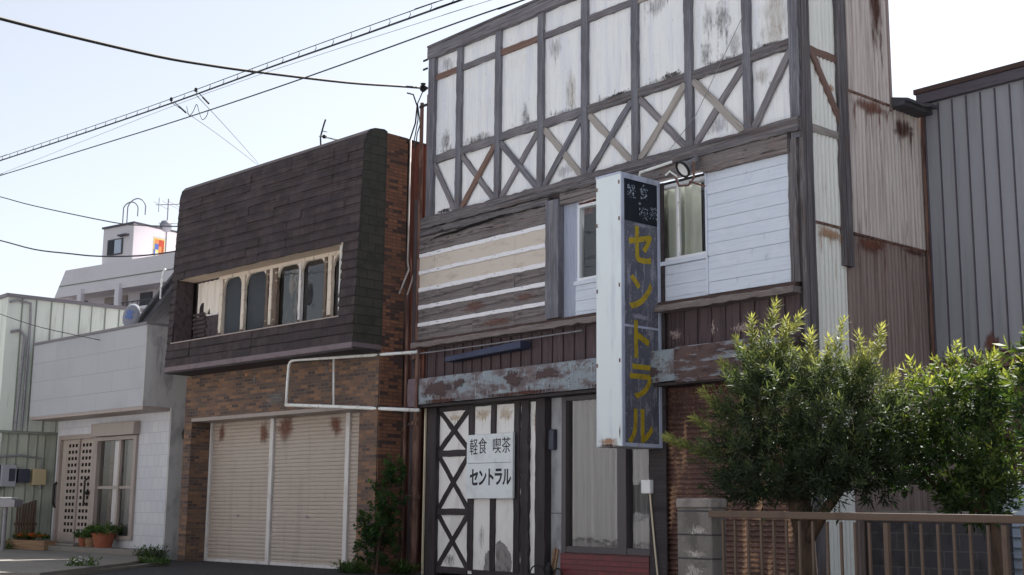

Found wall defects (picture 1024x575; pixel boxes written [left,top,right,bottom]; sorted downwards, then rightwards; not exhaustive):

rust [870,0,883,60]
rust [854,99,913,146]
peeling [422,378,464,397]
peeling [503,370,522,391]
peeling [535,367,560,379]
rust [279,418,290,438]